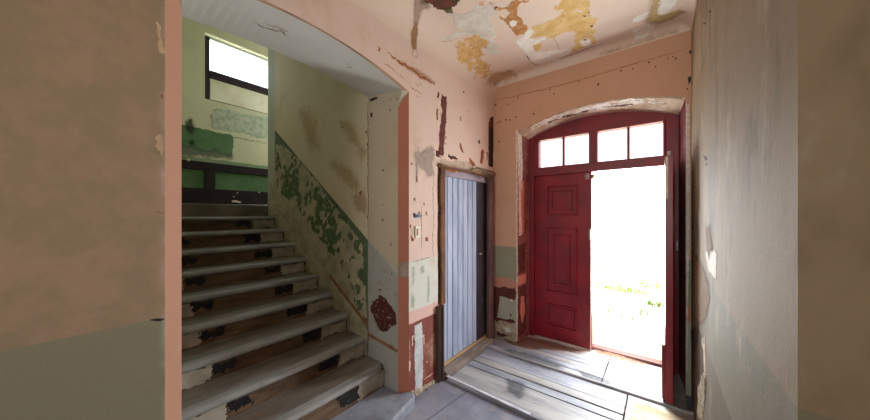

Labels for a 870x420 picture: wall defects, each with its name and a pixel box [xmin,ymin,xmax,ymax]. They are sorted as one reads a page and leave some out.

peeling [439,0,572,65]
crack [498,47,689,100]
peeling [182,108,268,161]
peeling [436,92,517,173]
peeling [182,256,198,267]
peeling [236,144,397,372]
peeling [706,249,717,280]
peeling [182,276,206,290]
peeling [182,300,214,318]
peeling [182,326,226,349]
peeling [182,358,238,390]
peeling [189,395,254,420]